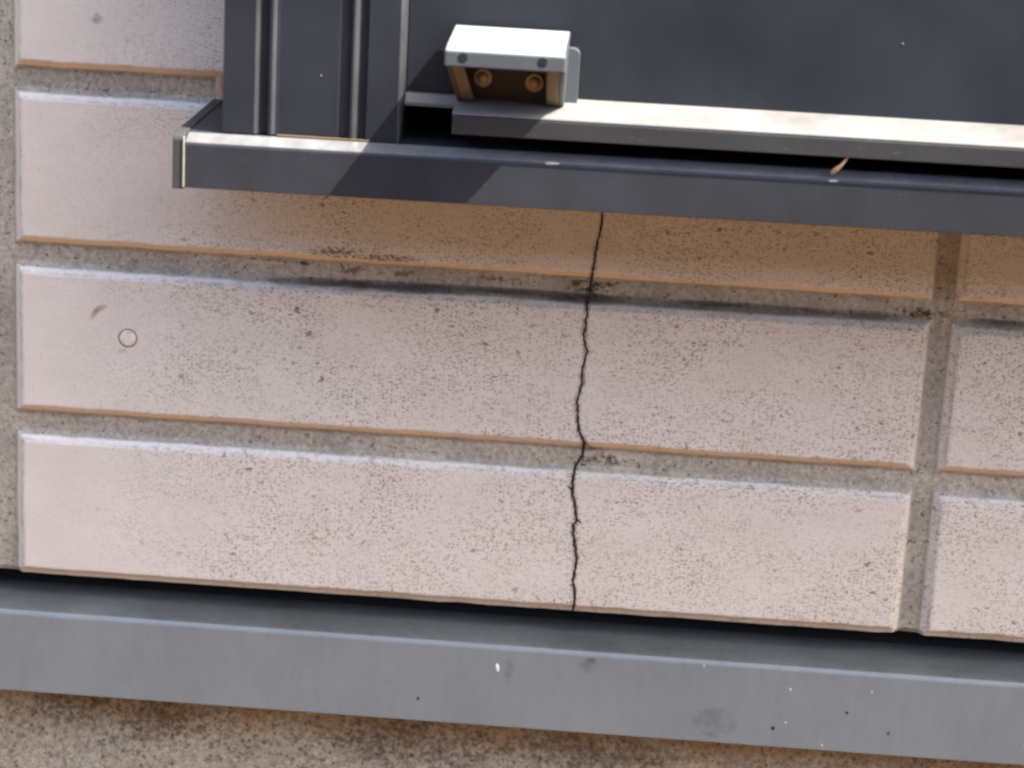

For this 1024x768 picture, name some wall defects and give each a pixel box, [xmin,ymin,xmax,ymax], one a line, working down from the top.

crack [567,212,603,611]